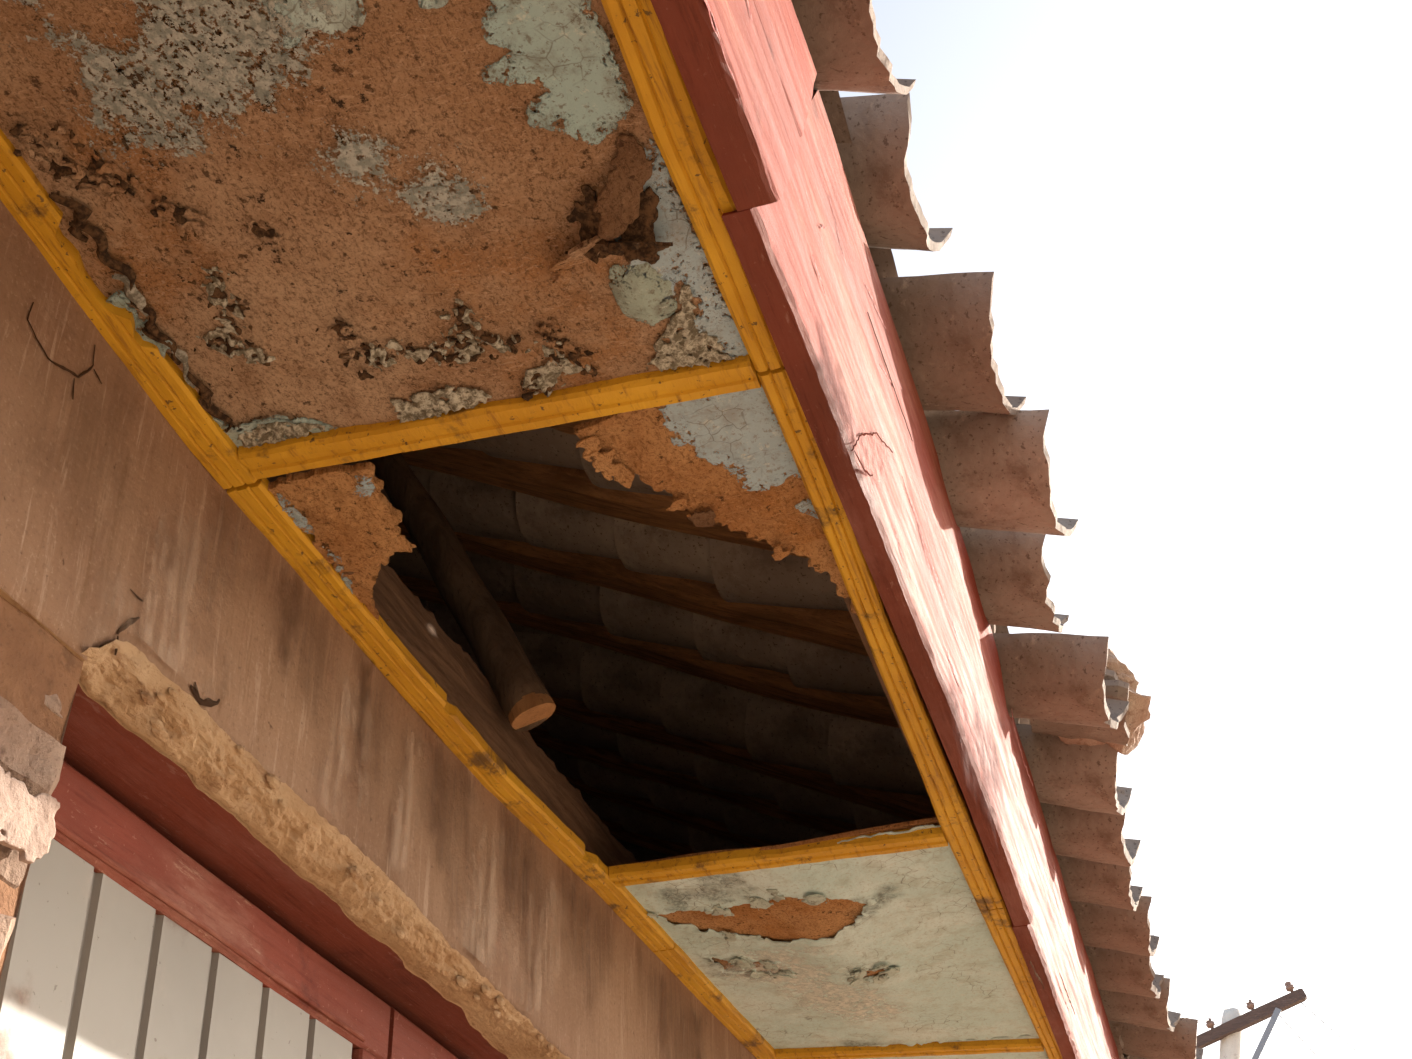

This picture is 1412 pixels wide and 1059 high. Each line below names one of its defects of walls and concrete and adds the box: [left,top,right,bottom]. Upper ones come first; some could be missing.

peeling [0,0,735,448]
crack [27,302,102,399]
peeling [576,436,635,488]
peeling [395,535,416,553]
peeling [771,543,790,561]
flaking render [0,766,60,864]
peeling [647,889,867,979]